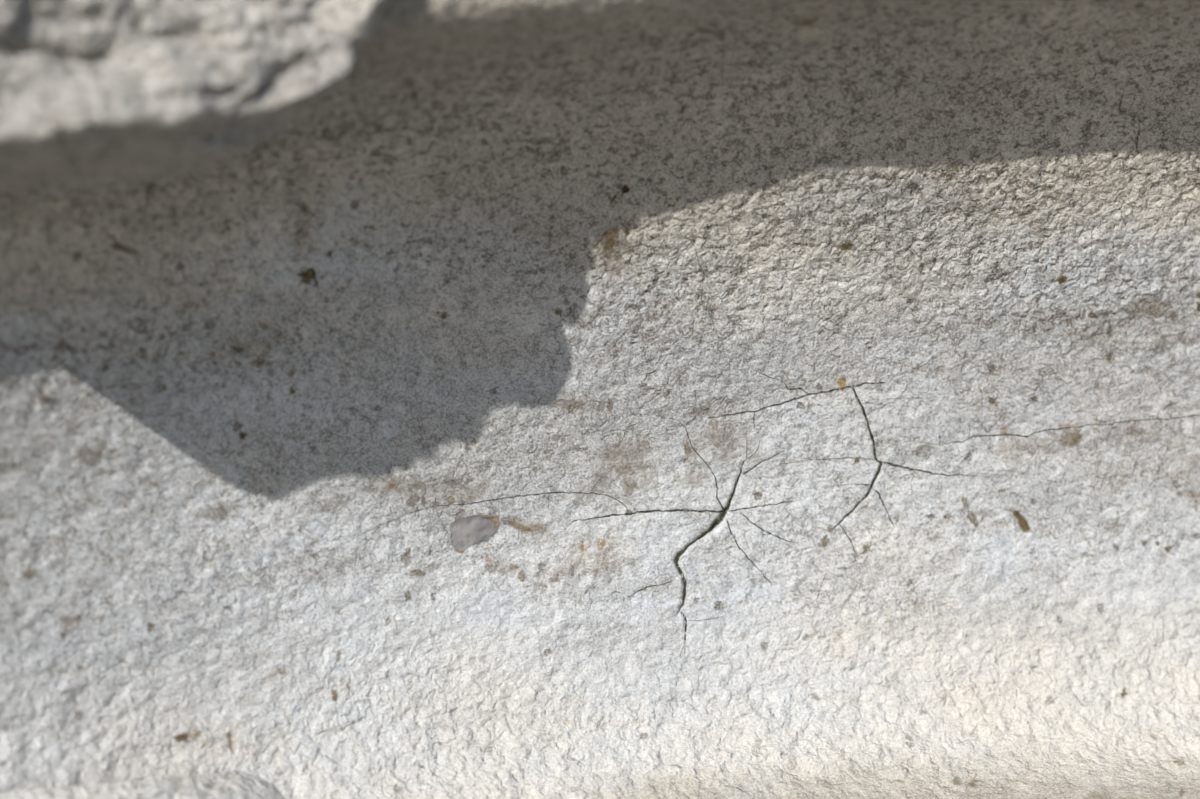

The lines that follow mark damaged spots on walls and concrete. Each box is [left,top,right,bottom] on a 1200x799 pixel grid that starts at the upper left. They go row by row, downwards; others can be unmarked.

crack [341,373,1200,655]